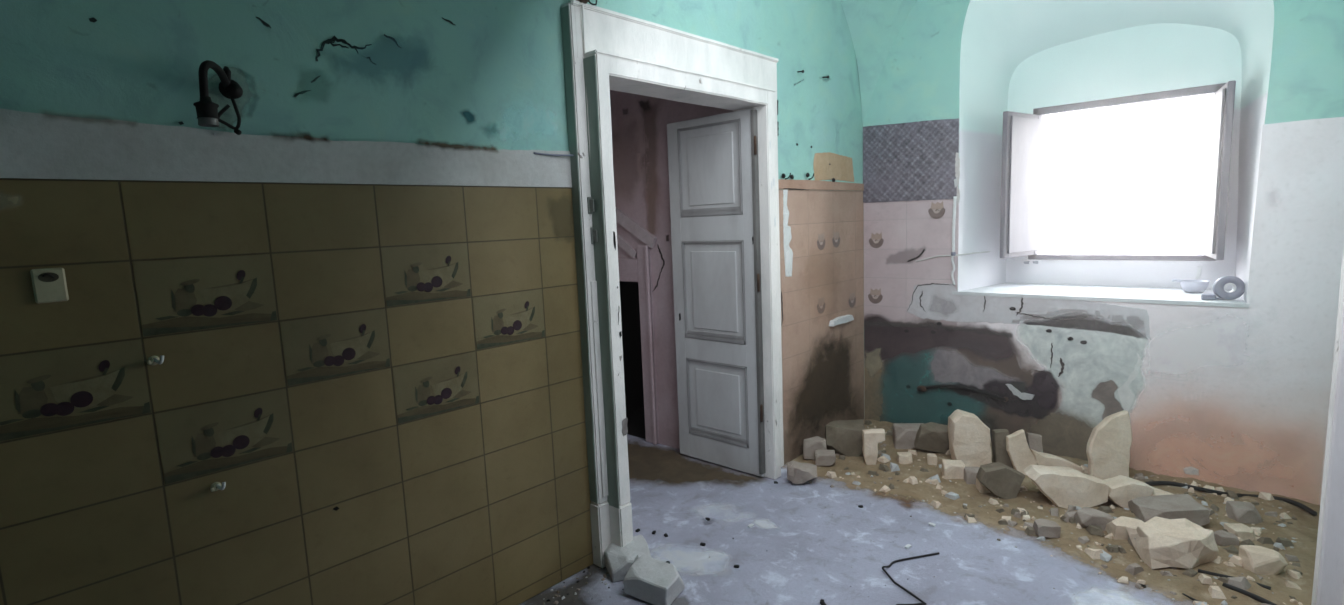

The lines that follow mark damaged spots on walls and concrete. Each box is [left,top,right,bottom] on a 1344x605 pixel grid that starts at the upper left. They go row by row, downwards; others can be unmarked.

crack [294,34,401,97]
flaking render [813,152,854,182]
leakage [930,347,1036,388]
peeling [907,283,1151,427]